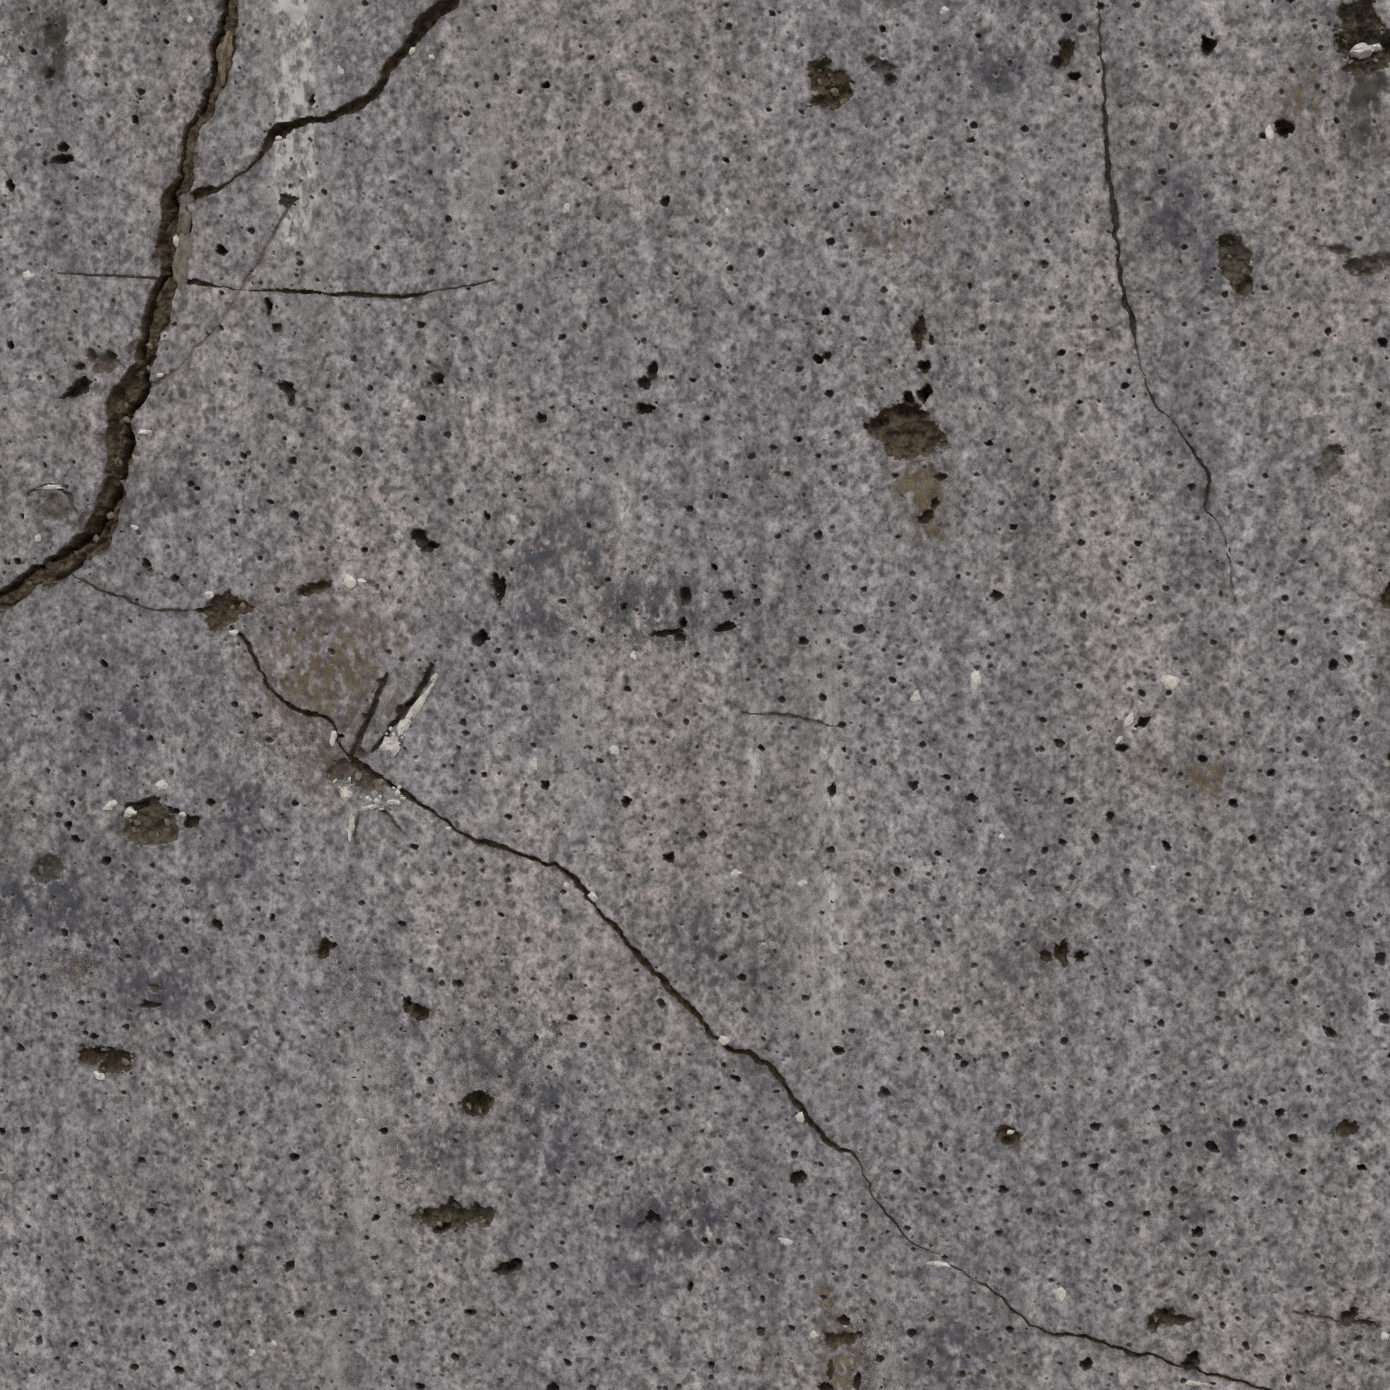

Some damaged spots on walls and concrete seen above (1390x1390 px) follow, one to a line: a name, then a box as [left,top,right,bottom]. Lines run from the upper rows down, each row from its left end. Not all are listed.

crack [0,0,501,630]
crack [1091,0,1242,608]
crack [223,623,1291,1390]
crack [1287,1305,1387,1333]